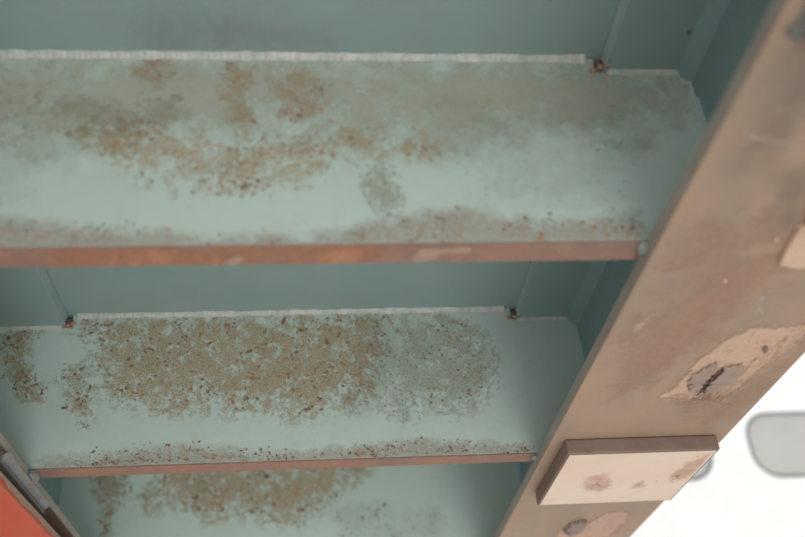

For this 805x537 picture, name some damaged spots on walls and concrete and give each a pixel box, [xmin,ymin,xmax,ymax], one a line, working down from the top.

rust [67,59,406,215]
rust [0,207,244,266]
rust [254,205,475,264]
peeling [778,223,805,269]
rust [0,330,50,403]
rust [60,313,495,428]
peeling [659,323,805,402]
rust [335,437,486,458]
rust [63,441,368,536]
peeling [556,508,632,537]